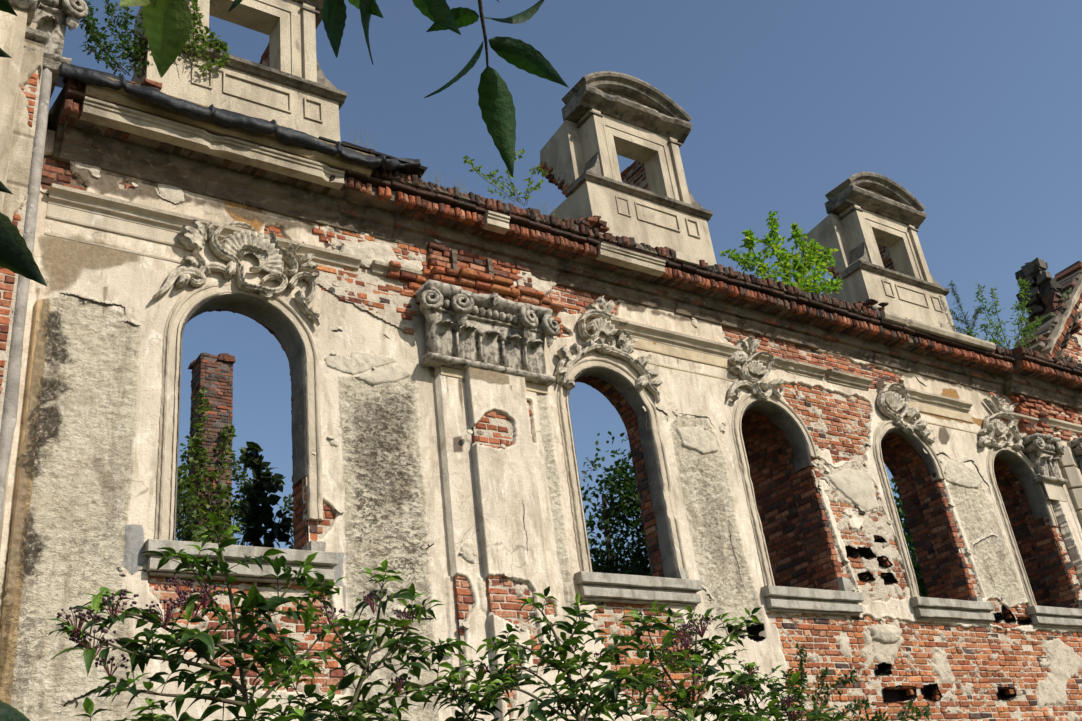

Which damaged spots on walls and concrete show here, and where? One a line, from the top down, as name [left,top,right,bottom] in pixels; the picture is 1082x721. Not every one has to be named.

spalling [303,224,442,335]
spalling [0,268,18,430]
leakage [3,237,138,606]
spalling [467,411,514,449]
leakage [123,525,147,573]
flaking render [459,542,477,564]
spalling [722,327,1082,721]
spalling [454,576,474,684]
spalling [486,572,559,719]